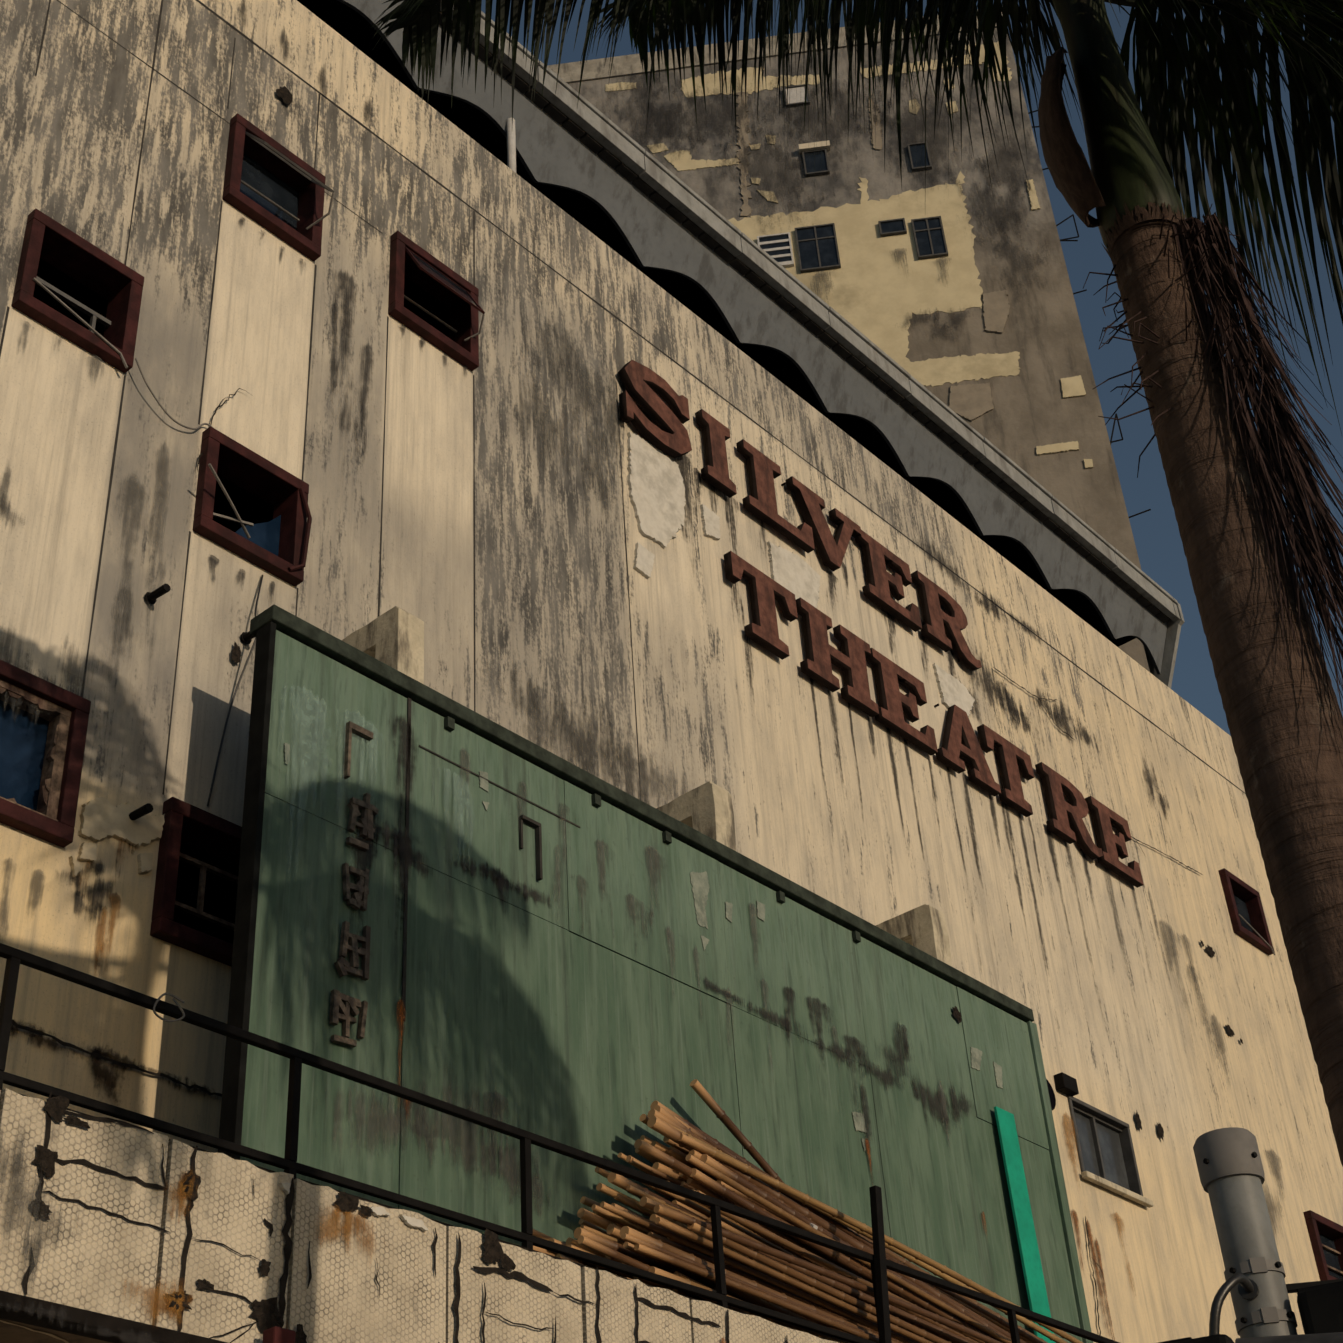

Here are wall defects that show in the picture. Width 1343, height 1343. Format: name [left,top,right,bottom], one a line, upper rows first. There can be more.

peeling [860,42,1012,114]
peeling [647,67,1021,422]
peeling [627,432,721,579]
peeling [767,541,821,608]
leakage [969,653,1097,746]
leakage [810,679,923,851]
leakage [928,754,981,874]
leakage [989,794,1093,967]
crack [36,1091,312,1343]
corrosion [131,1284,183,1317]
crack [432,1228,602,1343]
crack [634,1285,730,1343]